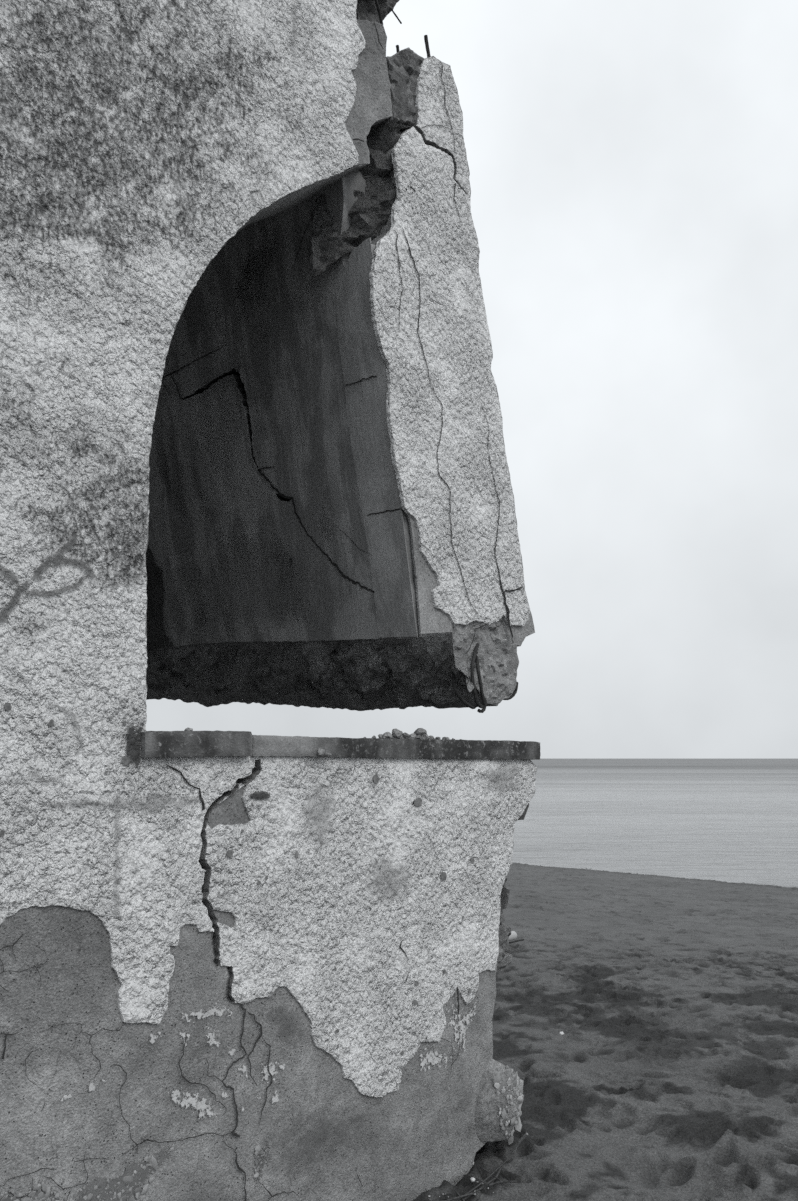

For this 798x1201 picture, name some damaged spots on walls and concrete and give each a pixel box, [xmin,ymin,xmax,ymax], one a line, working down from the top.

spalling [305,0,424,277]
crack [386,61,467,223]
crack [162,345,402,593]
crack [394,227,523,653]
spalling [146,515,517,711]
crack [0,759,299,1201]
flaking render [0,878,524,1201]